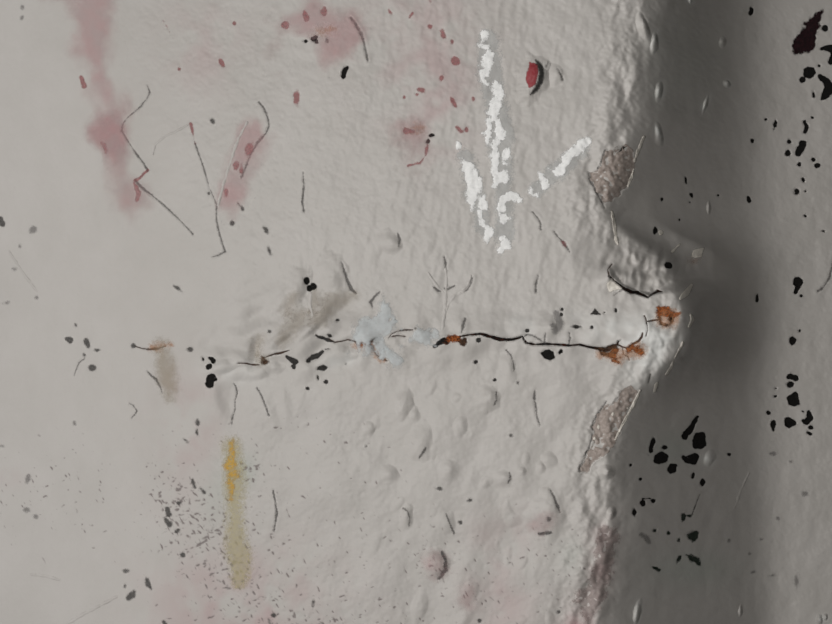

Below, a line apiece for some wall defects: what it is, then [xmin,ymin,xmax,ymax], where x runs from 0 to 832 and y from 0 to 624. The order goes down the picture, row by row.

peeling [588,135,645,245]
crack [329,329,412,361]
rust [433,335,467,348]
crack [460,264,663,359]
rust [599,344,644,364]
rust [656,306,681,327]
peeling [579,386,641,473]
peeling [649,415,706,486]